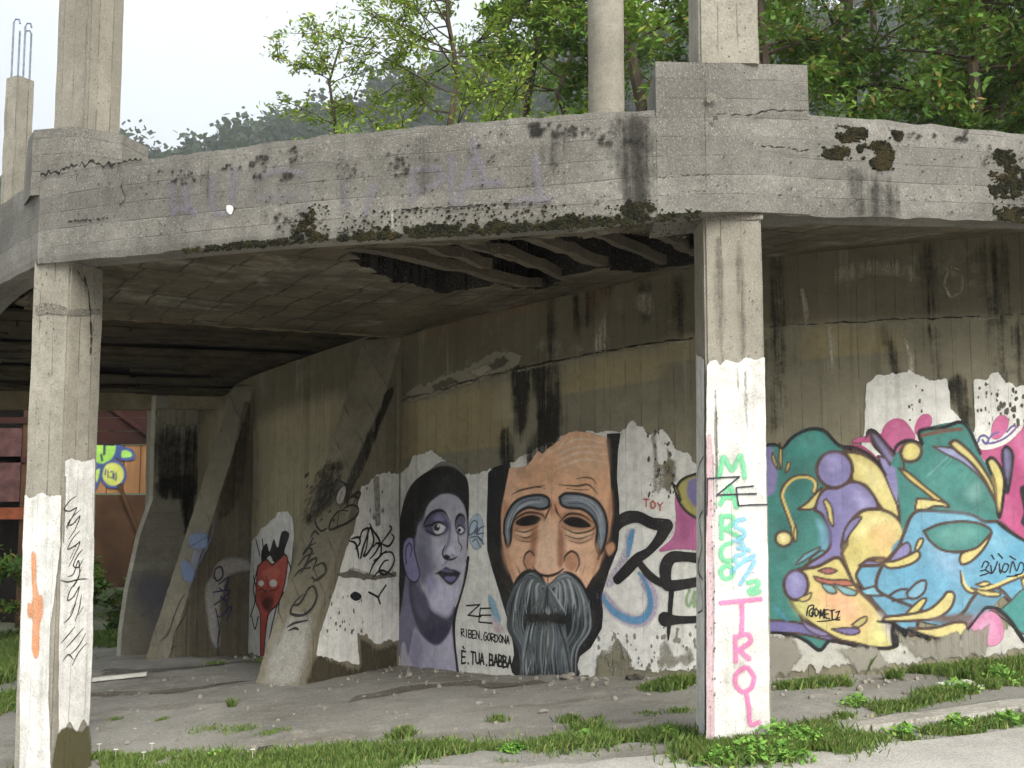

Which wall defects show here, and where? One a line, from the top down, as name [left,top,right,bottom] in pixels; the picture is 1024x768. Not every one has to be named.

crack [40,158,141,222]
water stain [615,115,649,215]
crack [658,89,818,193]
spalling [350,233,694,294]
crack [770,316,990,327]
spalling [404,350,523,401]
water stain [500,315,560,465]
crack [402,337,693,401]
water stain [156,407,199,533]